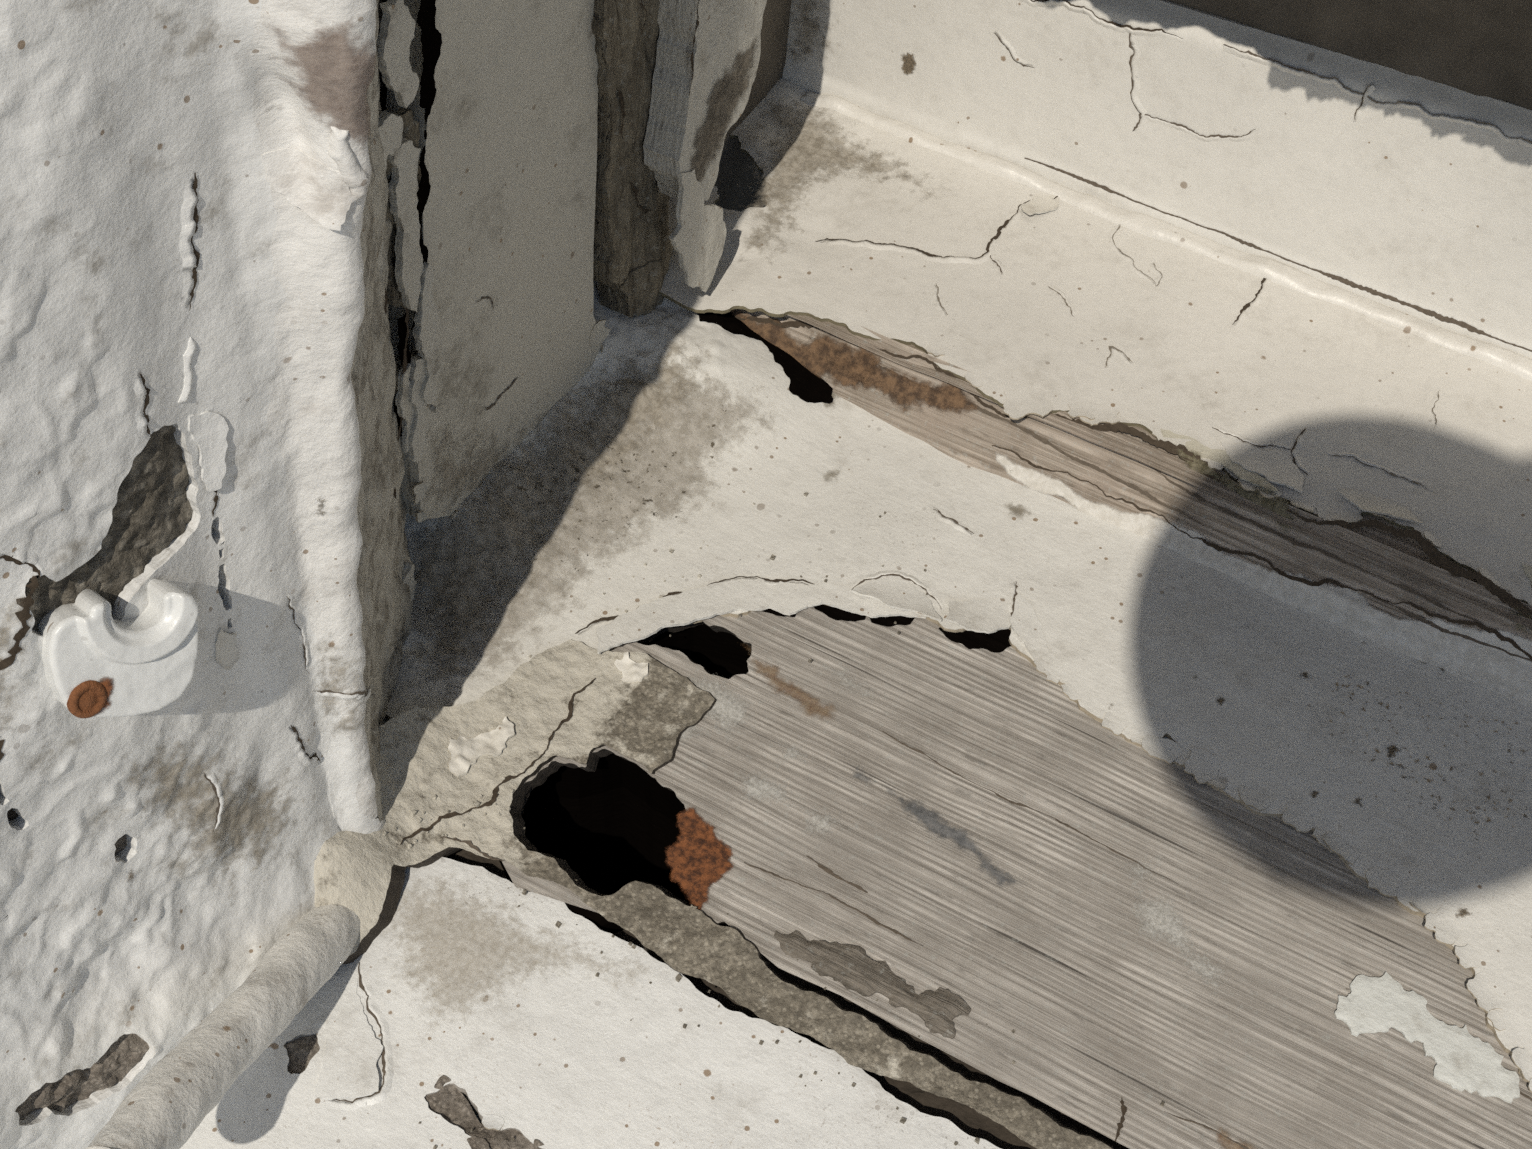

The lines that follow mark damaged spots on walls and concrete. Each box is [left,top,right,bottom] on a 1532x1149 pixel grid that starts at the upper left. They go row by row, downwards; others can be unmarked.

crack [995,0,1255,142]
crack [1223,44,1532,148]
crack [179,172,200,311]
crack [384,275,409,375]
peeling [1003,388,1120,426]
flaking render [25,411,229,631]
peeling [1152,420,1443,548]
peeling [1479,568,1522,601]
corrosion [666,808,732,910]
peeling [499,577,1532,1149]
flaking render [15,1033,150,1120]
spalling [425,1075,544,1149]